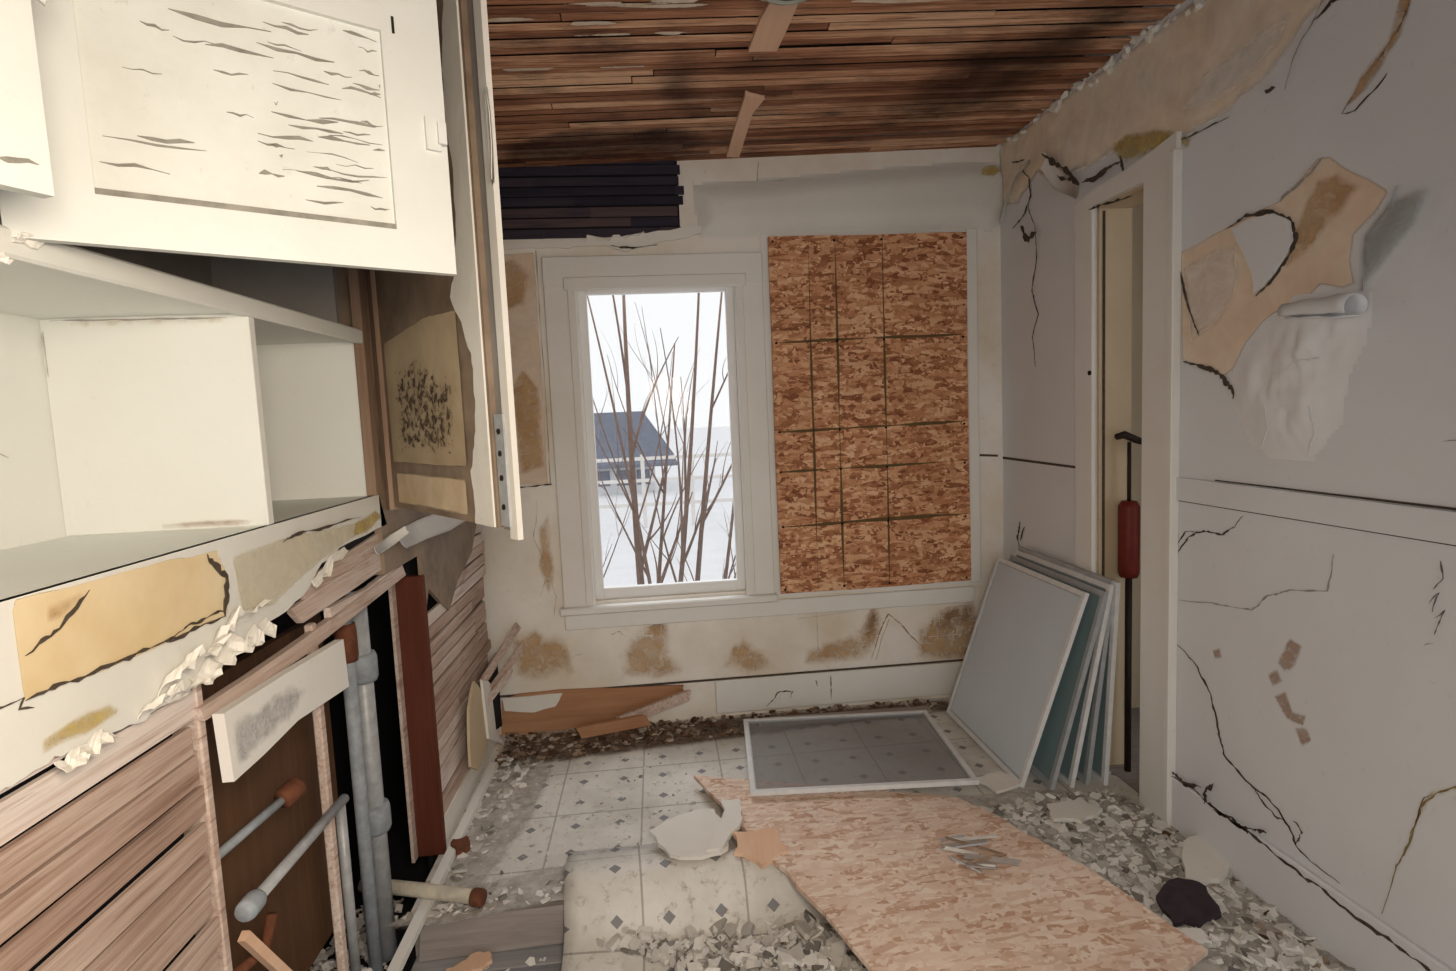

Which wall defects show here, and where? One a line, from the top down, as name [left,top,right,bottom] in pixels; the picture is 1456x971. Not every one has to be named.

flaking render [995,0,1337,221]
flaking render [498,155,701,488]
crack [1012,159,1039,367]
peeling [1180,157,1397,462]
flaking render [0,512,524,971]
crack [1178,516,1243,552]
crack [1180,554,1334,610]
peeling [1270,641,1310,744]
crack [1171,645,1456,971]
crack [1426,561,1445,645]